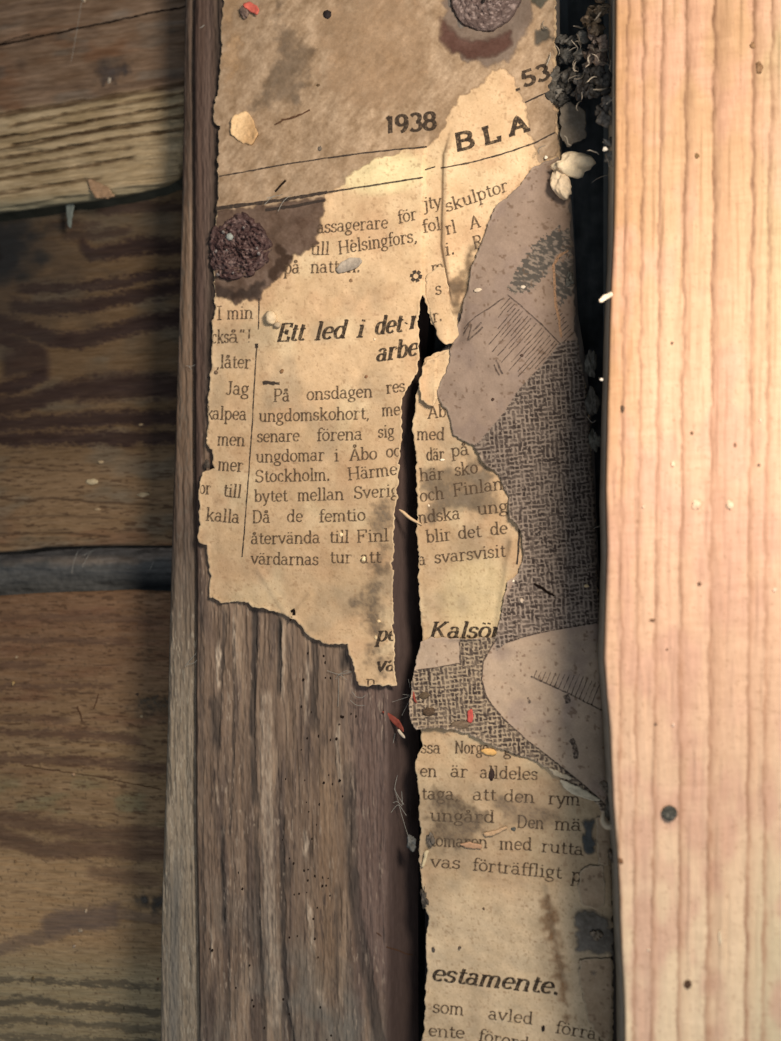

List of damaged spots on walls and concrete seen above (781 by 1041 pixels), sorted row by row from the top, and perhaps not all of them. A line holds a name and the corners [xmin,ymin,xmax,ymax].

leakage [544,896,556,940]